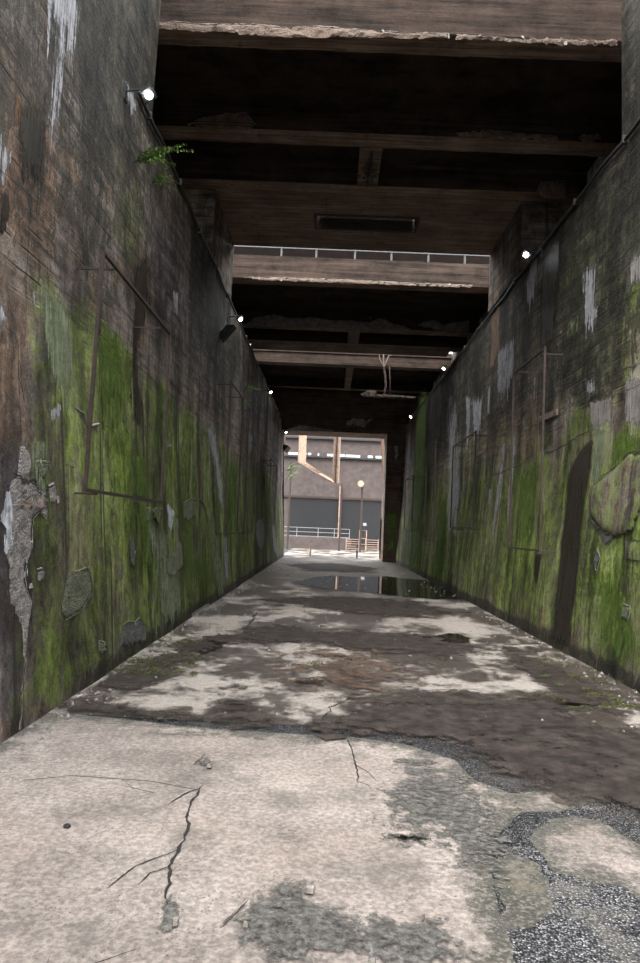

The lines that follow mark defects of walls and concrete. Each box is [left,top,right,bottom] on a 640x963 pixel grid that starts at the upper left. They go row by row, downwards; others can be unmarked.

damp [0,0,79,234]
spalling [6,446,59,659]
damp [51,379,68,421]
damp [102,257,151,455]
damp [205,421,223,511]
damp [466,302,514,451]
damp [488,436,516,537]
damp [520,519,542,586]
damp [552,380,612,647]
damp [572,260,597,335]
crack [29,775,201,912]
spalling [220,877,483,963]